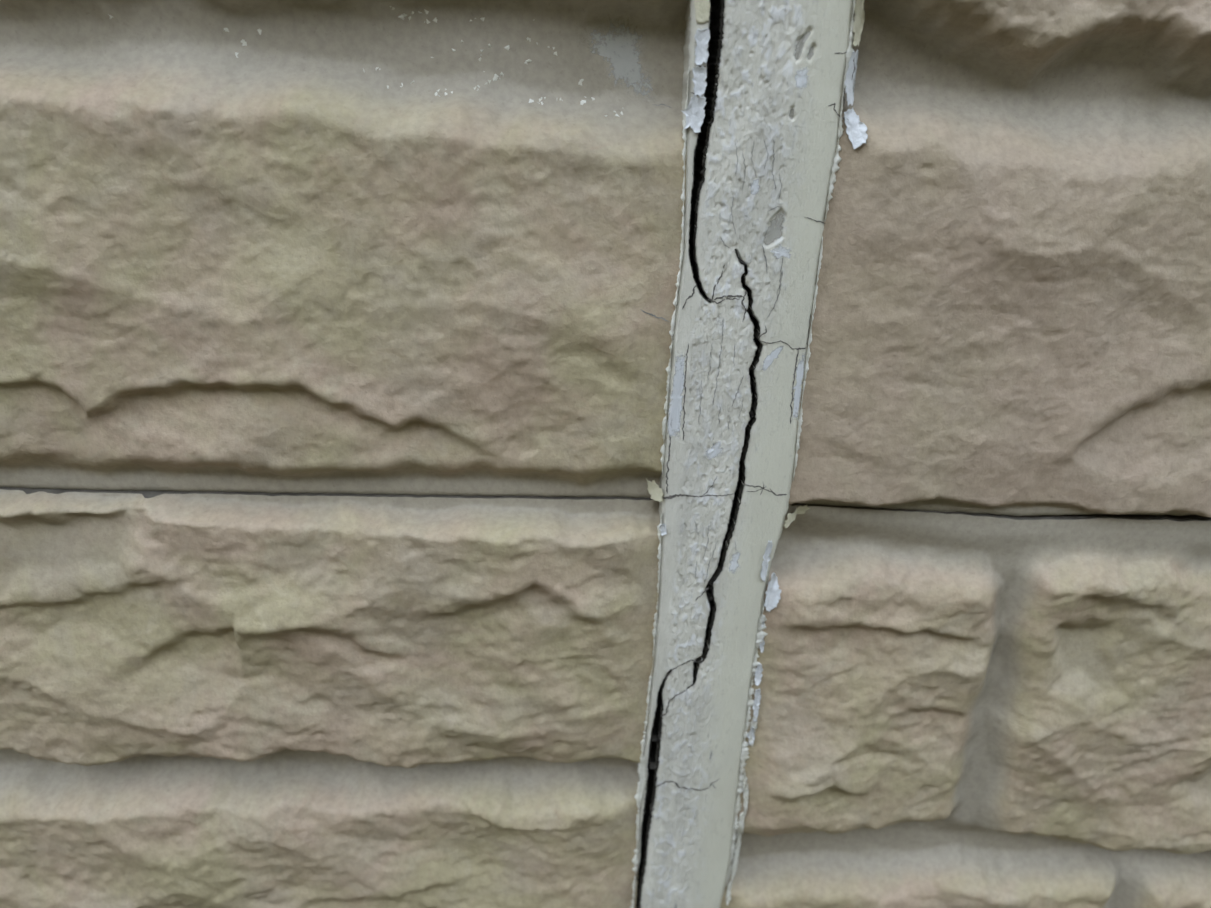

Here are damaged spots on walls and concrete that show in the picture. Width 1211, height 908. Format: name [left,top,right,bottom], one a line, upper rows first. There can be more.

peeling [660,0,711,477]
crack [636,0,825,908]
spalling [764,214,784,245]
spalling [795,31,813,59]
peeling [793,236,823,480]
peeling [824,0,868,221]
peeling [726,540,781,905]